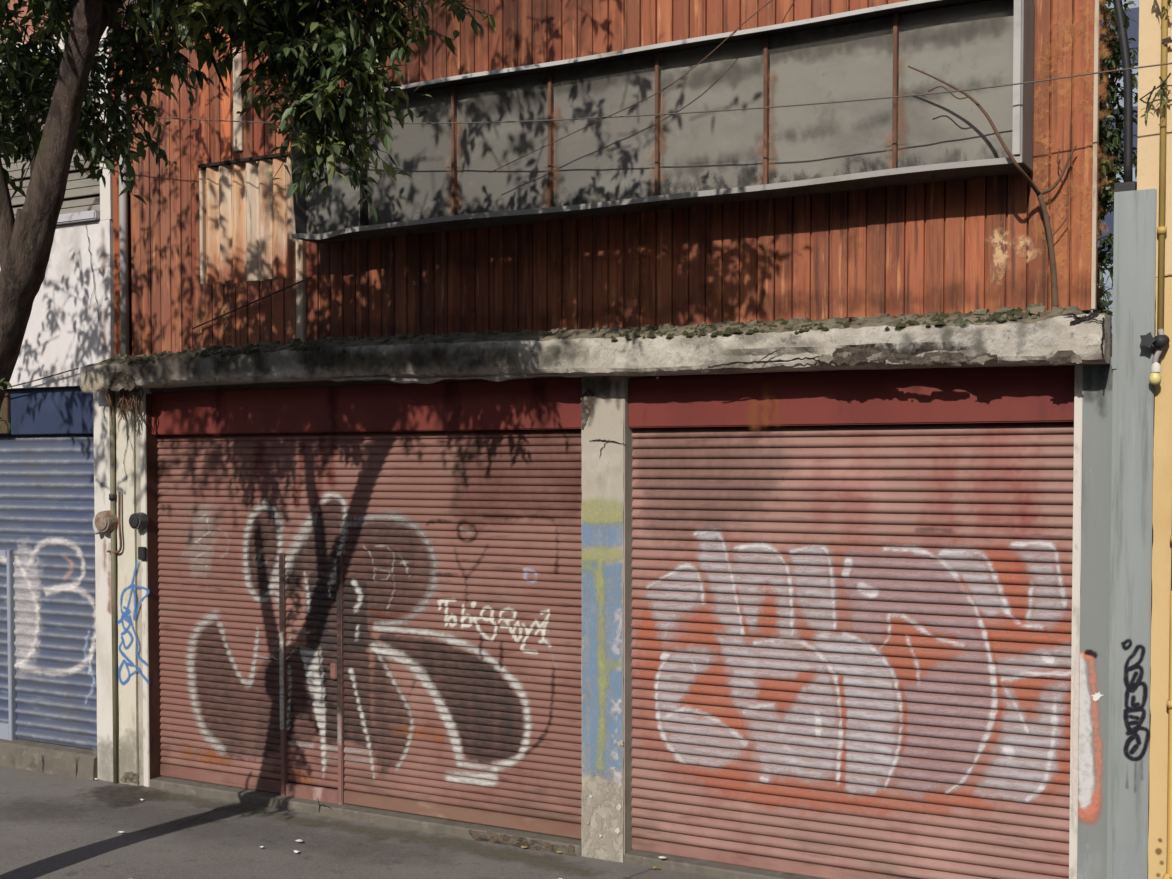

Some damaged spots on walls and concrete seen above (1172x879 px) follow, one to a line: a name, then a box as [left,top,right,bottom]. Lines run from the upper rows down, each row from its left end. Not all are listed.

water stain [653,166,820,205]
peeling [991,231,1033,283]
crack [1063,310,1105,361]
crack [708,349,842,368]
spalling [832,346,997,366]
spalling [1047,350,1082,365]
crack [589,439,626,459]